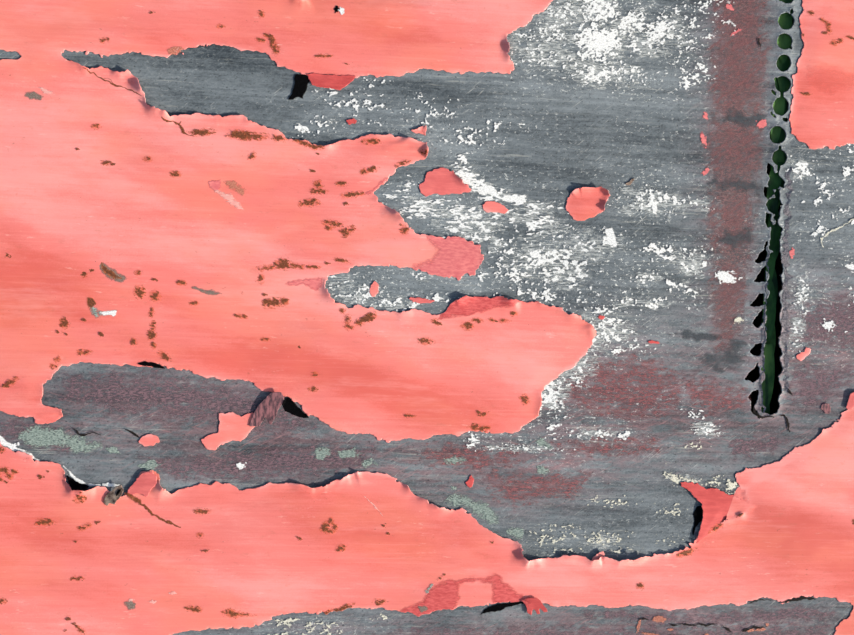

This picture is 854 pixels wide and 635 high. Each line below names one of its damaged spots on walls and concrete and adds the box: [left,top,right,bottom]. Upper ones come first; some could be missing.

peeling [789,0,854,149]
rust [299,169,325,208]
peeling [0,0,610,443]
rust [259,259,350,281]
rust [134,271,171,360]
rust [262,293,289,307]
rust [340,309,376,330]
peeling [139,434,160,446]
peeling [201,412,255,450]
peeling [735,403,854,520]
crack [124,493,181,528]
peeling [0,442,854,635]